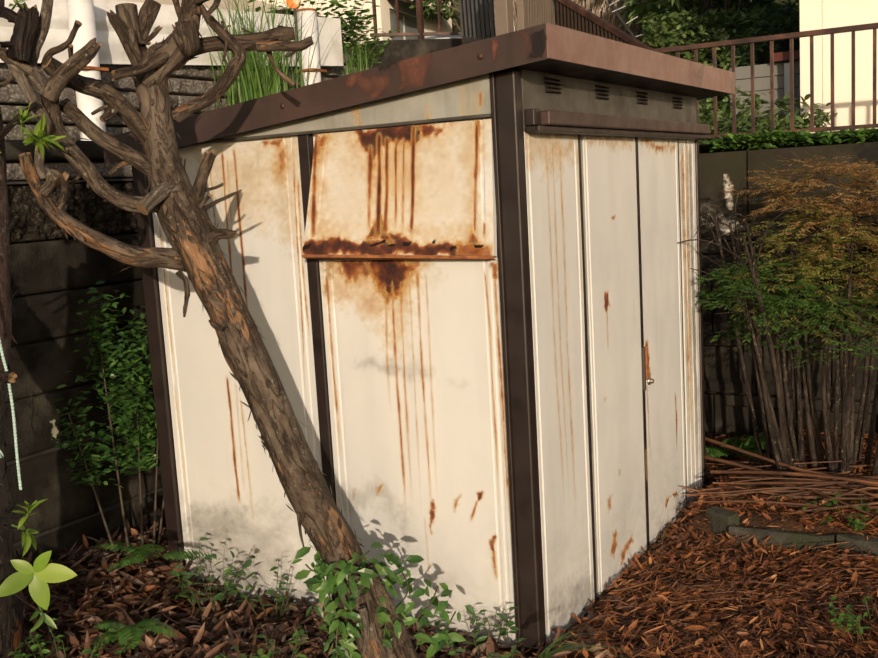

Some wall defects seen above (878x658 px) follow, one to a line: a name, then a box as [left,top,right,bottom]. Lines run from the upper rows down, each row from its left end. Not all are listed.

corrosion [221,151,247,305]
corrosion [263,120,508,489]
corrosion [226,378,245,499]
corrosion [489,535,497,575]
corrosion [611,531,633,565]